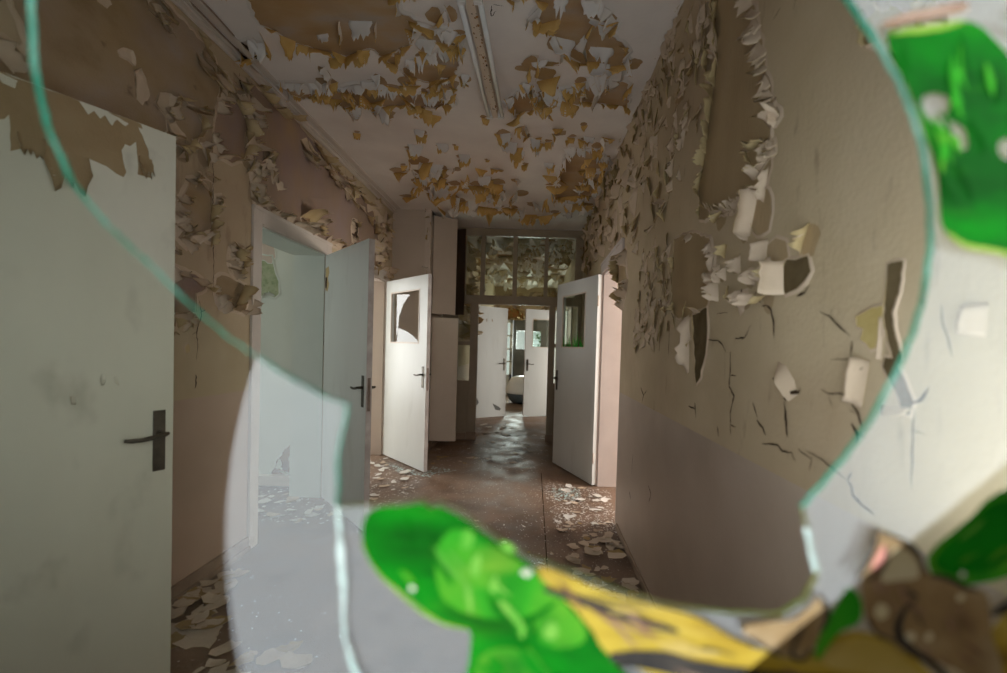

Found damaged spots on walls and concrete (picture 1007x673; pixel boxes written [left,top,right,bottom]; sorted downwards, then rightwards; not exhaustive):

peeling [0,0,820,386]
crack [708,288,875,515]